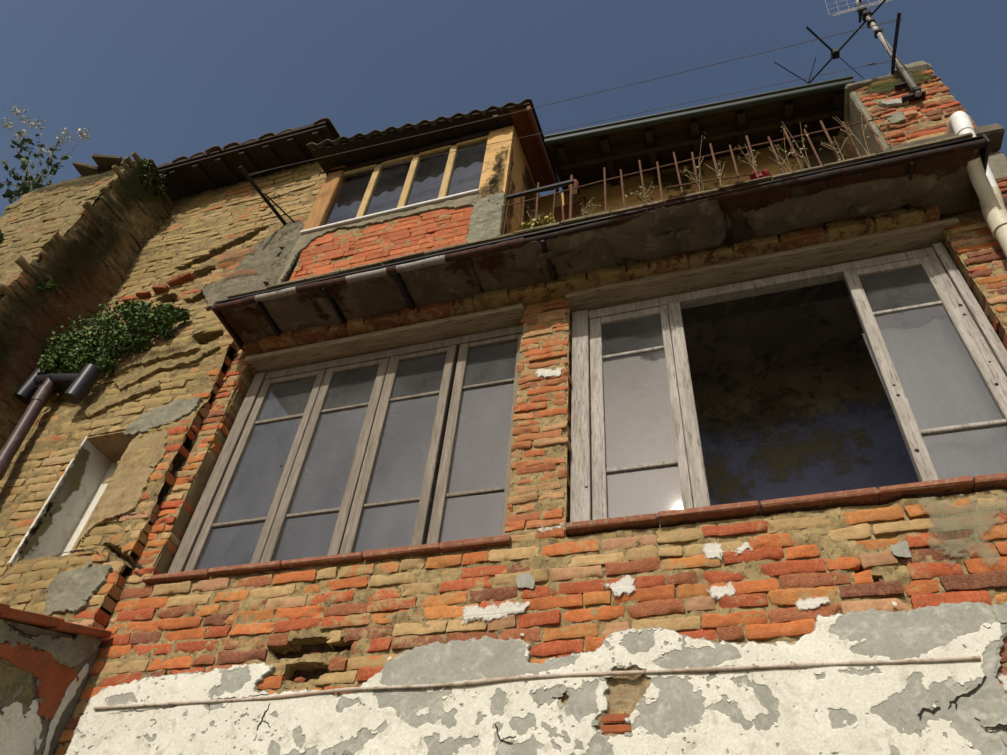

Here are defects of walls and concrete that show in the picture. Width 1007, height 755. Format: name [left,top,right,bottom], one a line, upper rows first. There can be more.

leakage [478,150,535,235]
crack [54,511,144,559]
peeling [105,693,138,706]
peeling [204,665,251,727]
spalling [275,643,351,683]
peeling [336,695,362,713]
peeling [373,629,780,755]
peeling [828,602,1007,755]
crack [917,676,987,719]
peeling [267,721,388,755]